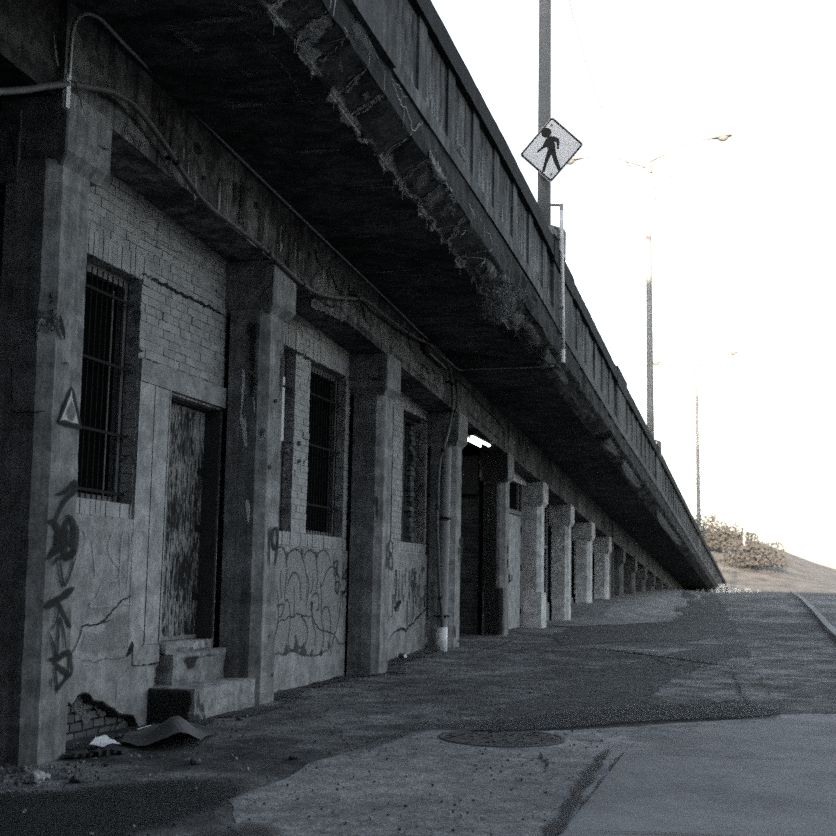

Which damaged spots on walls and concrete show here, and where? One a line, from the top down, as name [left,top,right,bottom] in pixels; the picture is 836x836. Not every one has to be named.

crack [227,0,492,267]
spalling [424,150,451,184]
crack [126,217,225,315]
crack [72,589,161,691]
crack [276,613,345,644]
crack [388,606,428,639]
spalling [66,692,138,741]